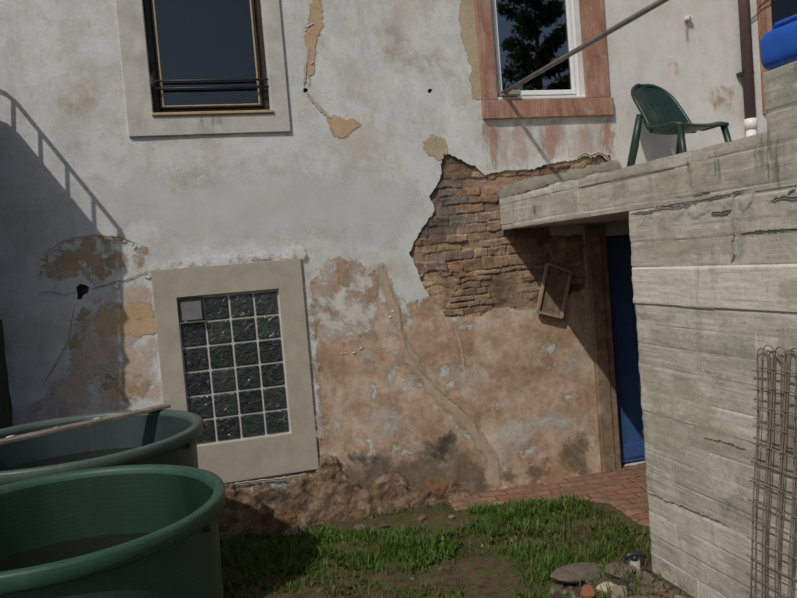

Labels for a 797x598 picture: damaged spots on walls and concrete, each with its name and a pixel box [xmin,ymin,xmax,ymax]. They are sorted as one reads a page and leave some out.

peeling [302,0,361,138]
peeling [458,0,482,100]
crack [631,189,797,263]
peeling [28,234,163,418]
peeling [218,134,612,540]
damp [343,429,488,494]
damp [562,437,588,476]